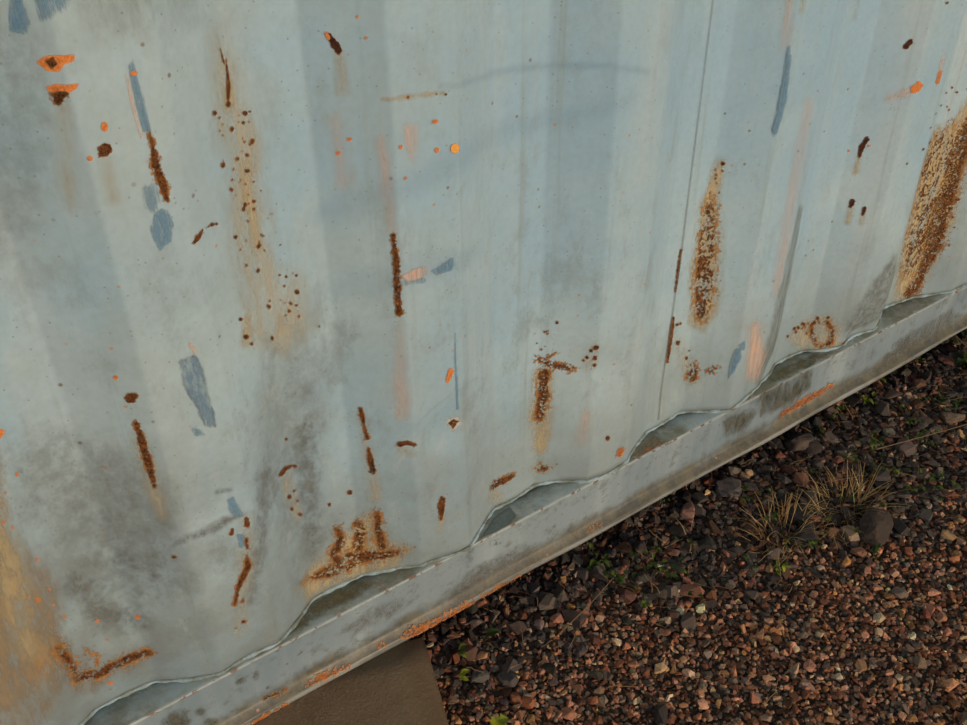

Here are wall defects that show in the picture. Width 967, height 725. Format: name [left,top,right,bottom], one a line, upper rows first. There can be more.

peeling [37,55,75,72]
peeling [46,84,79,106]
rust [146,128,171,203]
rust [213,48,300,346]
rust [896,103,967,301]
rust [390,232,404,317]
rust [666,161,730,363]
rust [787,316,845,349]
rust [132,419,162,515]
rust [300,407,410,596]
rust [227,497,253,607]